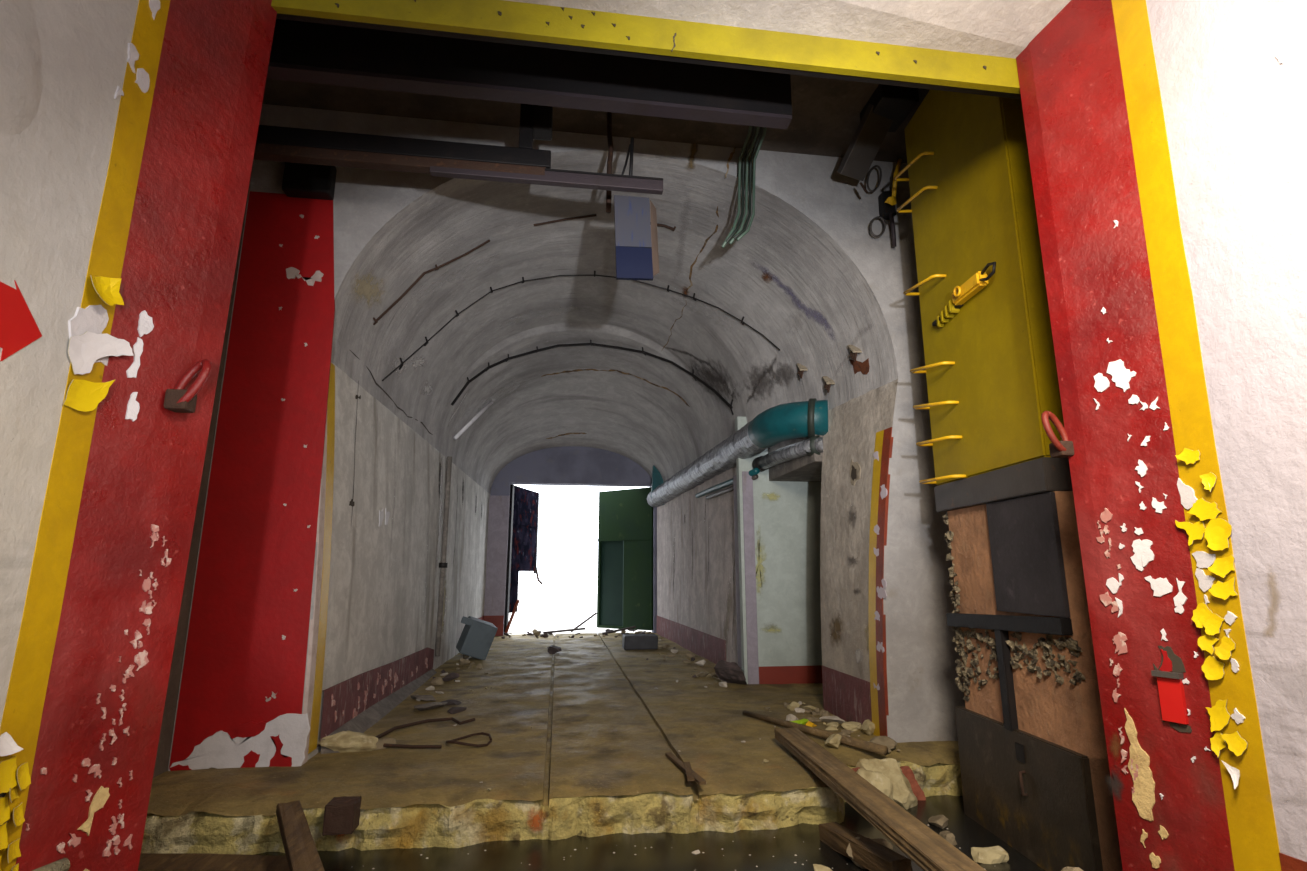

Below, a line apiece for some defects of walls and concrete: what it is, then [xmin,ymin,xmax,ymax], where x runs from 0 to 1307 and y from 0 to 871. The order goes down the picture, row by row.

peeling [63,275,154,421]
peeling [286,267,324,286]
crack [662,147,736,350]
peeling [0,732,47,871]
peeling [56,524,172,857]
spalling [168,657,428,771]
spalling [942,513,1086,702]
peeling [1093,359,1248,868]